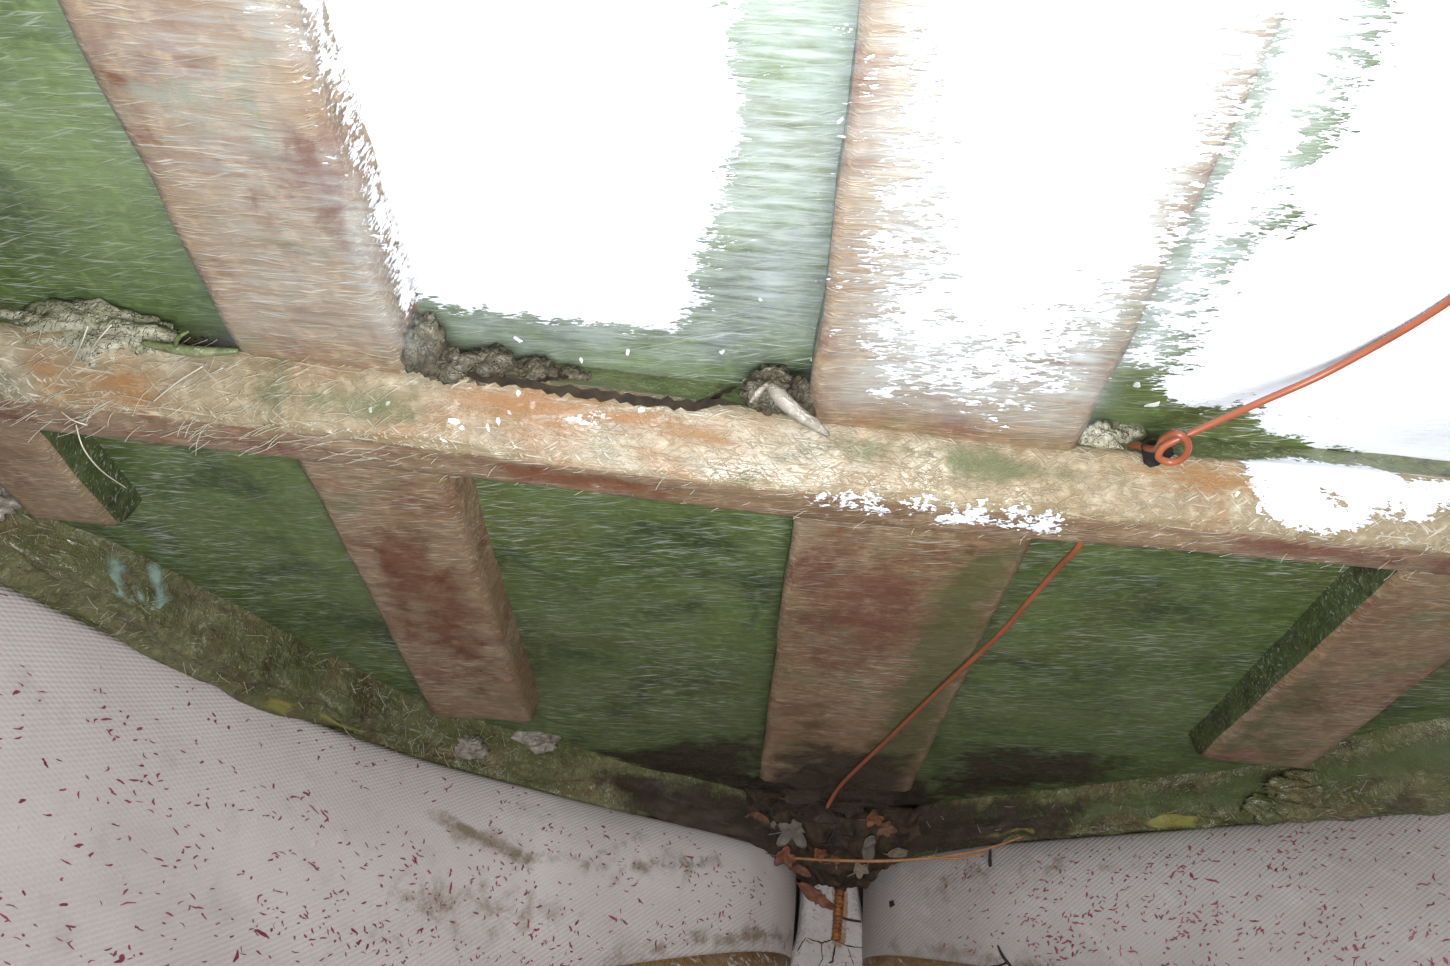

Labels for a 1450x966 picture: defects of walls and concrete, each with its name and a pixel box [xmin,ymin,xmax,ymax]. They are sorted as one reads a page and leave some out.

damp [1146,814,1197,828]